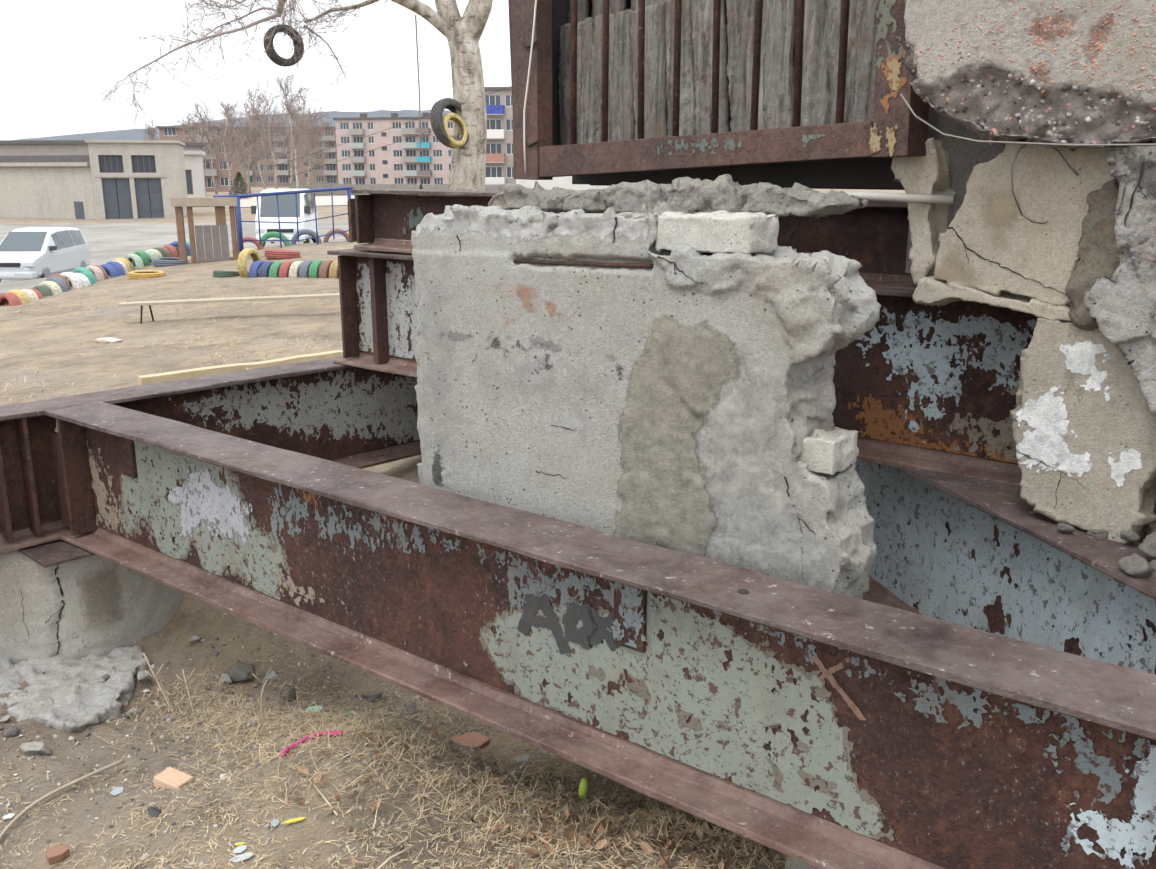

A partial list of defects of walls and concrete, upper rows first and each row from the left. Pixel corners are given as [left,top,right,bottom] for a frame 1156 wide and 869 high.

corrosion [869,50,911,157]
peeling [356,261,373,352]
peeling [385,260,417,359]
spalling [402,205,650,242]
crack [948,227,1066,295]
peeling [168,370,420,444]
corrosion [848,391,1018,464]
peeling [857,307,1093,478]
crack [21,564,65,653]
peeling [87,440,897,843]
peeling [854,460,1156,675]
peeling [838,647,1156,869]